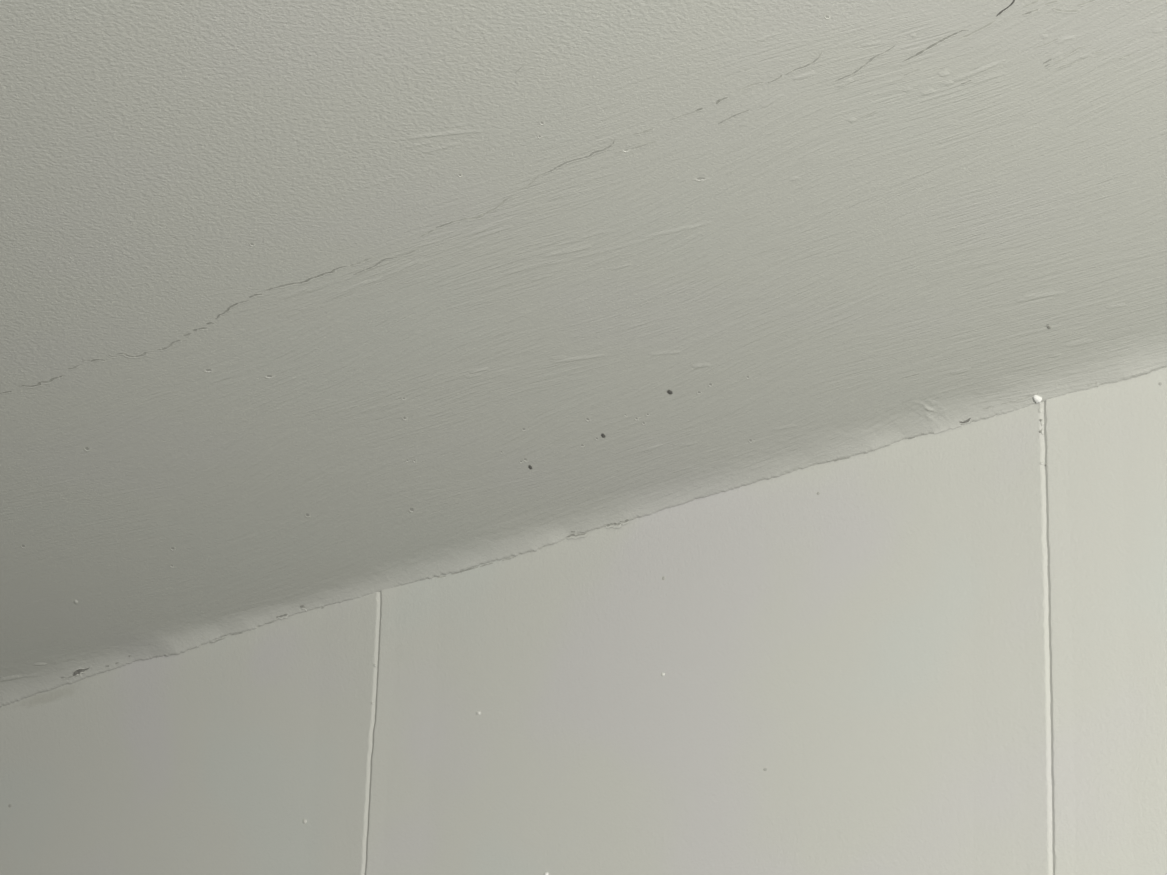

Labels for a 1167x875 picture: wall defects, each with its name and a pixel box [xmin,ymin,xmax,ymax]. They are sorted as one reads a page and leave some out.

crack [0,0,1057,395]